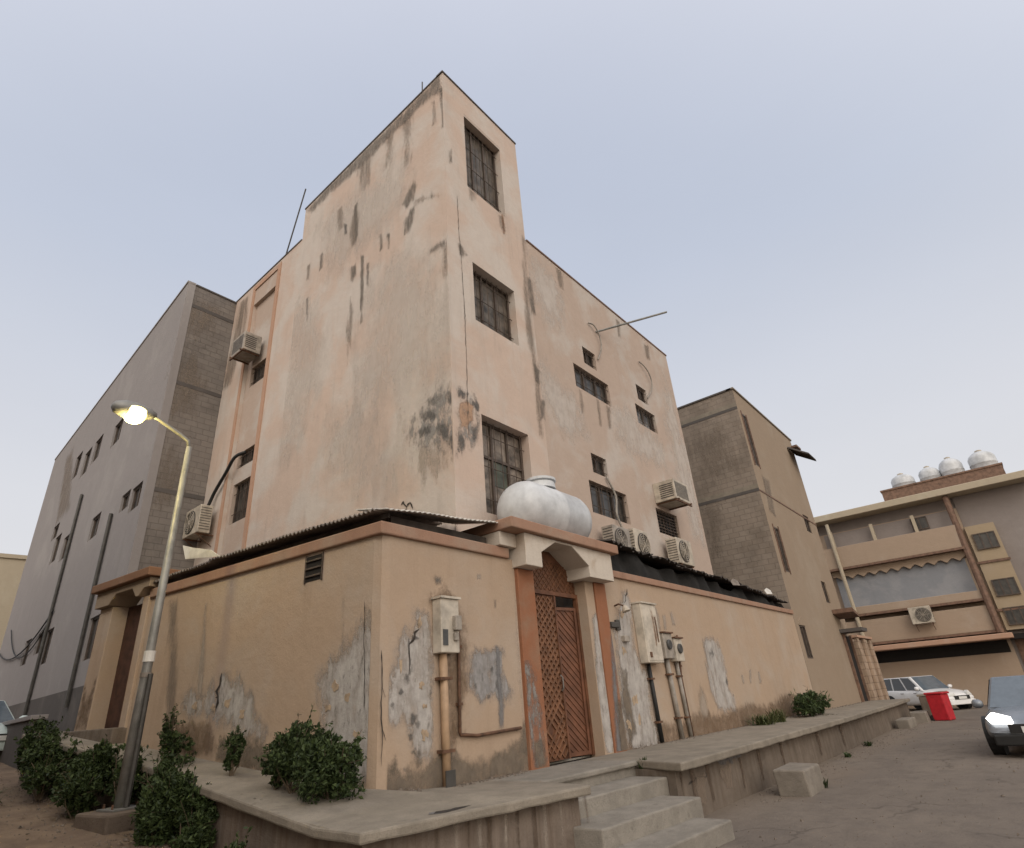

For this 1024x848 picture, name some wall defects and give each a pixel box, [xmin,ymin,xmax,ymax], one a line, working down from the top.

water stain [339,204,357,245]
water stain [404,184,415,232]
water stain [350,255,369,325]
water stain [409,389,479,454]
crack [214,673,222,711]
peeling [317,616,371,784]
peeling [388,612,434,759]
crack [409,629,419,671]
peeling [469,647,511,726]
peeling [615,593,658,748]
peeling [700,637,735,718]